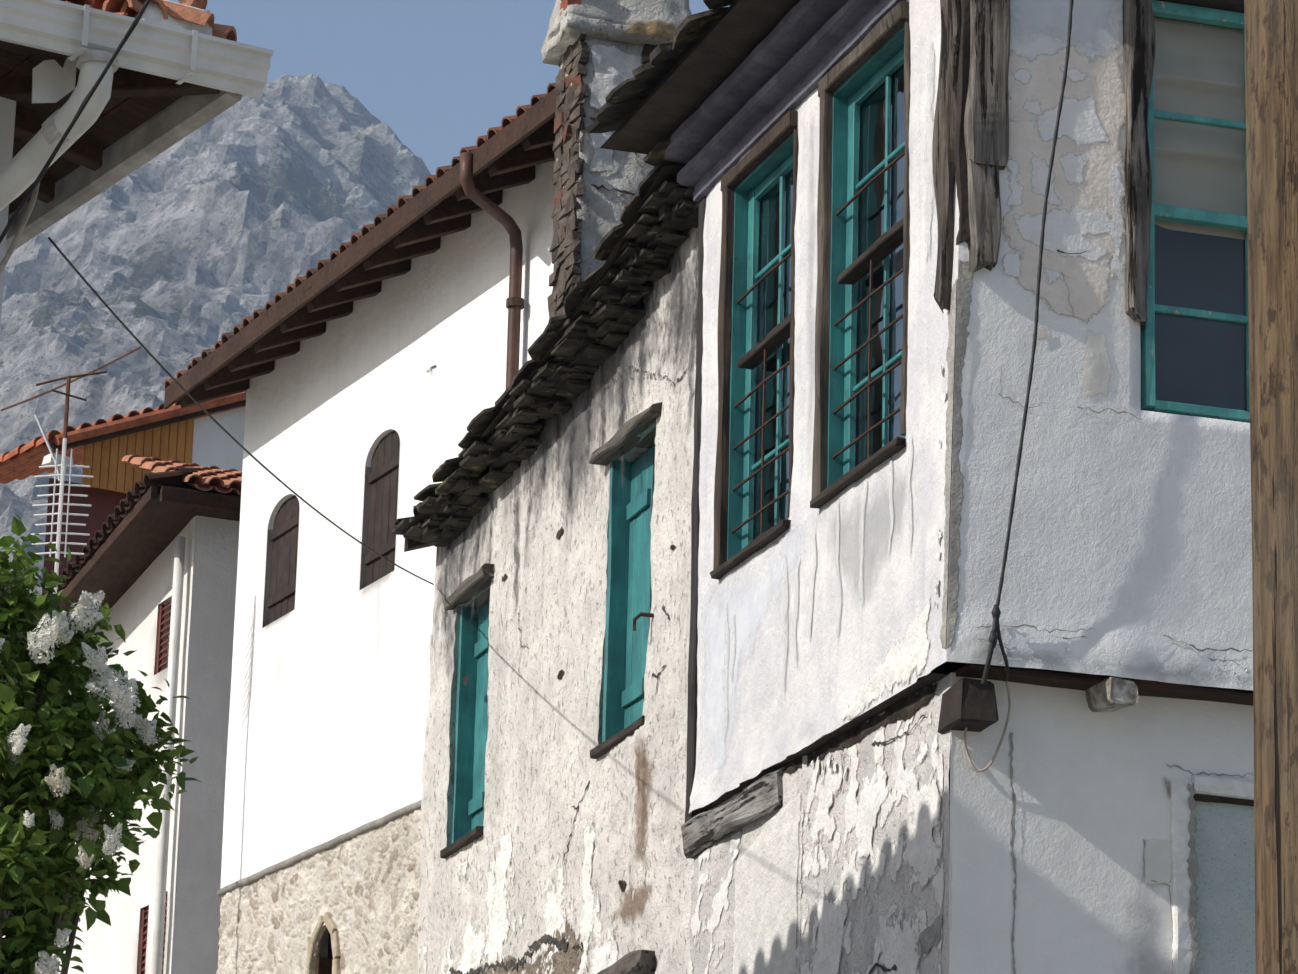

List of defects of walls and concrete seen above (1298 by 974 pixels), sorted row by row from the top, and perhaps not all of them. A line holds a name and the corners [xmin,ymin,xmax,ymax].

flaking render [1002,42,1126,340]
damp [435,492,493,656]
damp [504,249,699,606]
flaking render [780,260,973,974]
crack [999,367,1142,420]